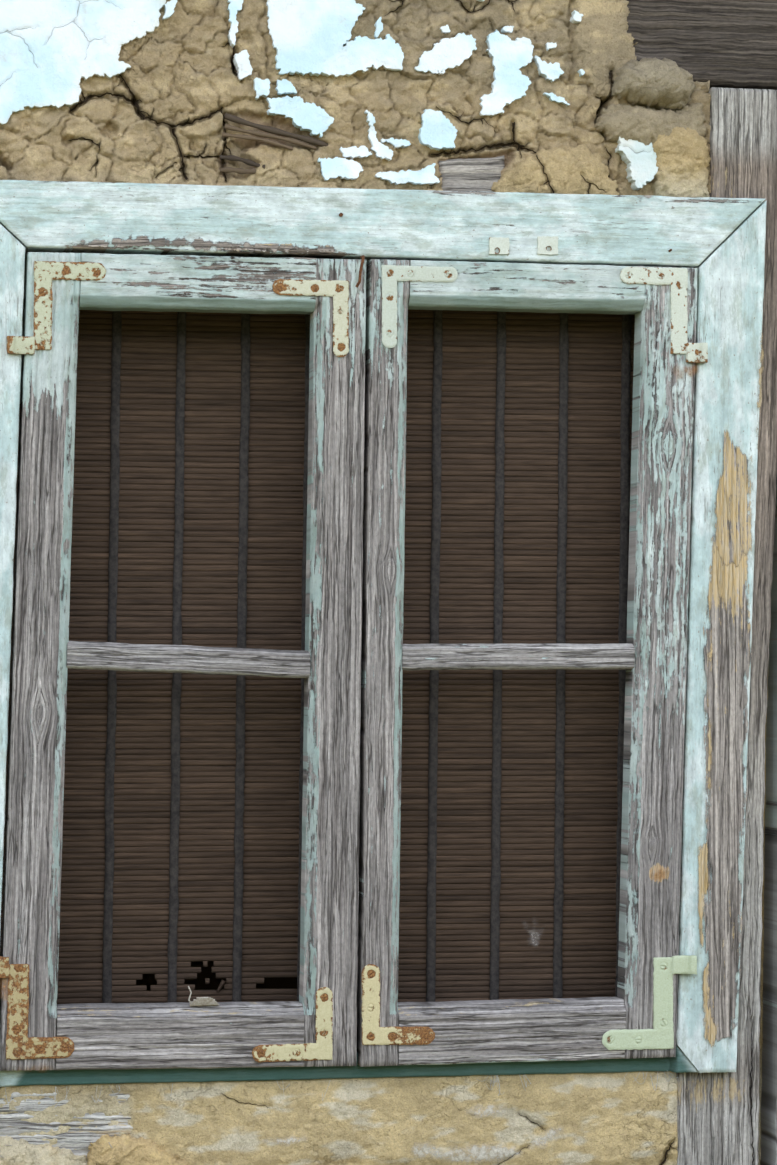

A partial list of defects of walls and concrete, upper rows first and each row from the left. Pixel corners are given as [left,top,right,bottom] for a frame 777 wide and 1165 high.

crack [0,7,99,86]
flaking render [0,0,177,125]
flaking render [227,0,585,138]
crack [68,74,231,182]
flaking render [317,109,458,185]
flaking render [615,137,659,191]
peeling [698,429,758,1046]
crack [660,1141,675,1165]